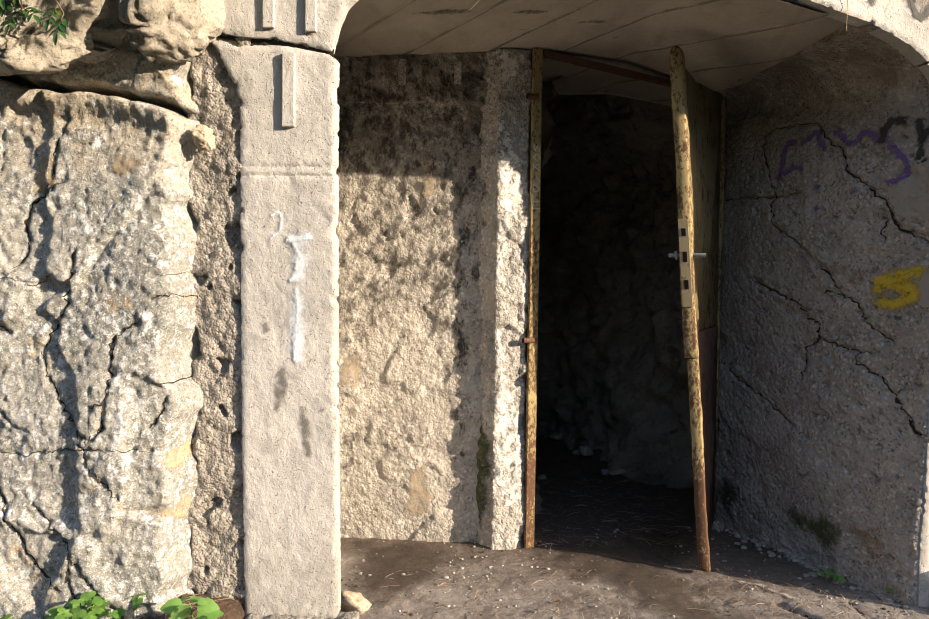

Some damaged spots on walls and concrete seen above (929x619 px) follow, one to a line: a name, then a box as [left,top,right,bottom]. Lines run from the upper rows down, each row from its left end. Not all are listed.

crack [0,489,123,619]
crack [0,117,149,499]
crack [149,376,192,428]
crack [152,272,198,299]
damp [336,55,484,378]
crack [725,123,929,441]